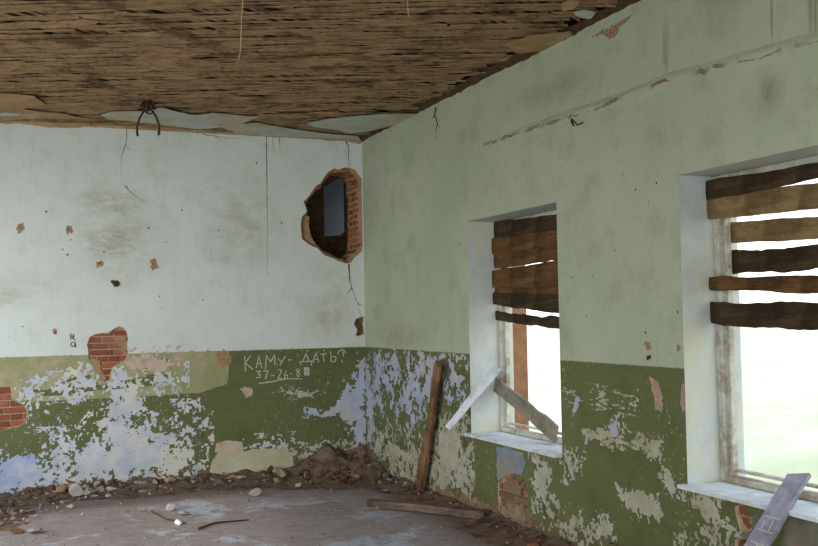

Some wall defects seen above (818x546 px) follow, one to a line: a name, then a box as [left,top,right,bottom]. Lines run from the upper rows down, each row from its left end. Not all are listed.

flaking render [558,0,641,41]
flaking render [404,52,539,114]
flaking render [0,120,393,144]
spalling [301,167,363,264]
flaking render [215,348,232,368]
peeling [0,326,214,495]
peeling [242,344,761,546]